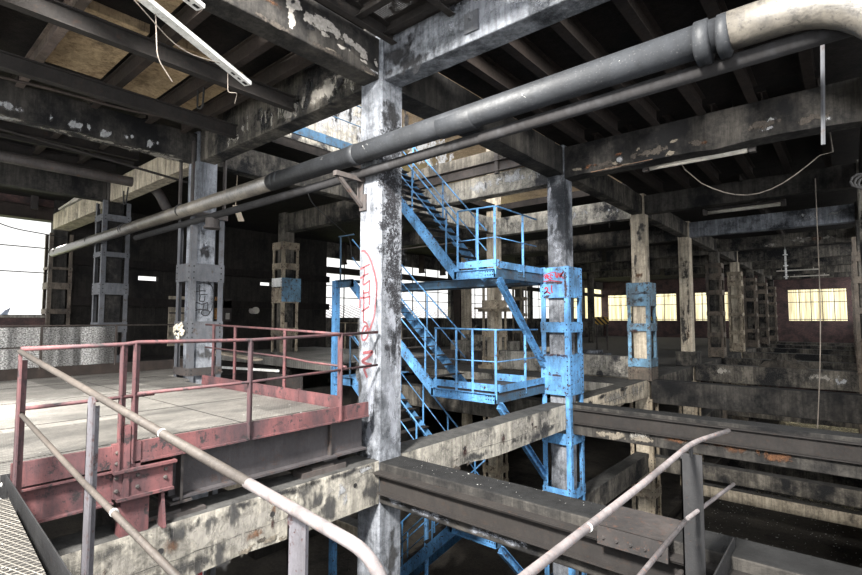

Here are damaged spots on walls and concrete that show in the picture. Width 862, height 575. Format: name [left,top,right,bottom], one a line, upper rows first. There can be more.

peeling [255,0,378,76]
spalling [748,117,782,131]
spalling [572,139,678,172]
water stain [276,465,379,519]
water stain [96,544,135,575]
water stain [159,501,279,575]